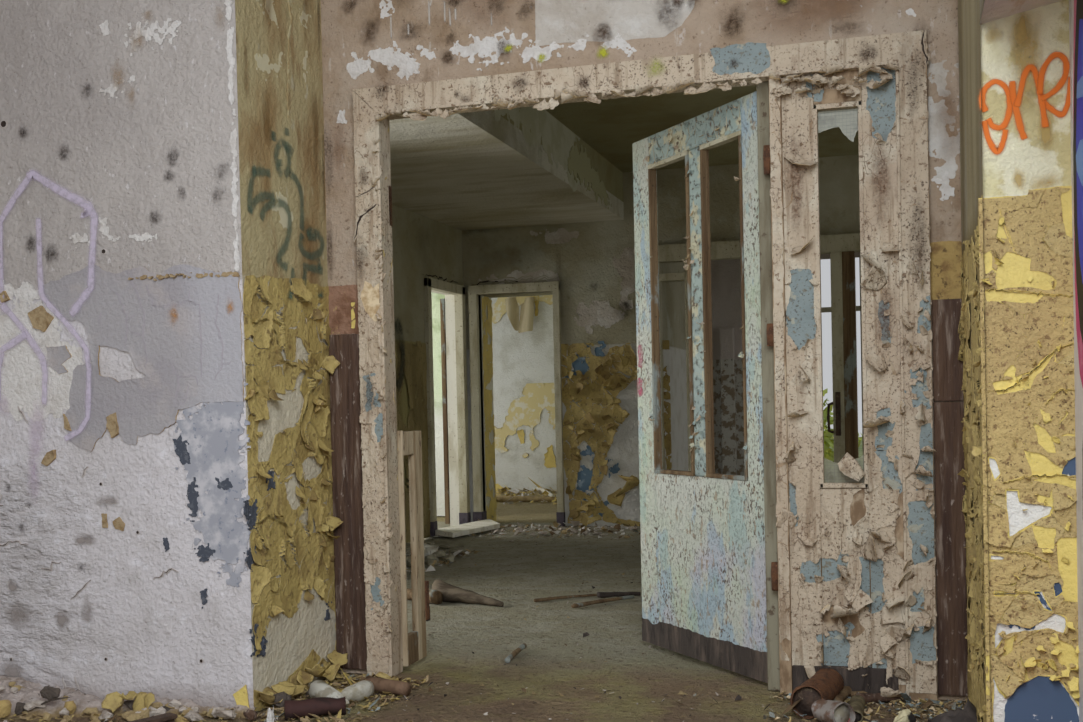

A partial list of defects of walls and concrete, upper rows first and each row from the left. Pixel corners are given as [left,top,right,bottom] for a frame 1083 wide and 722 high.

peeling [233,644,348,711]
peeling [0,0,770,672]
peeling [769,0,1080,722]